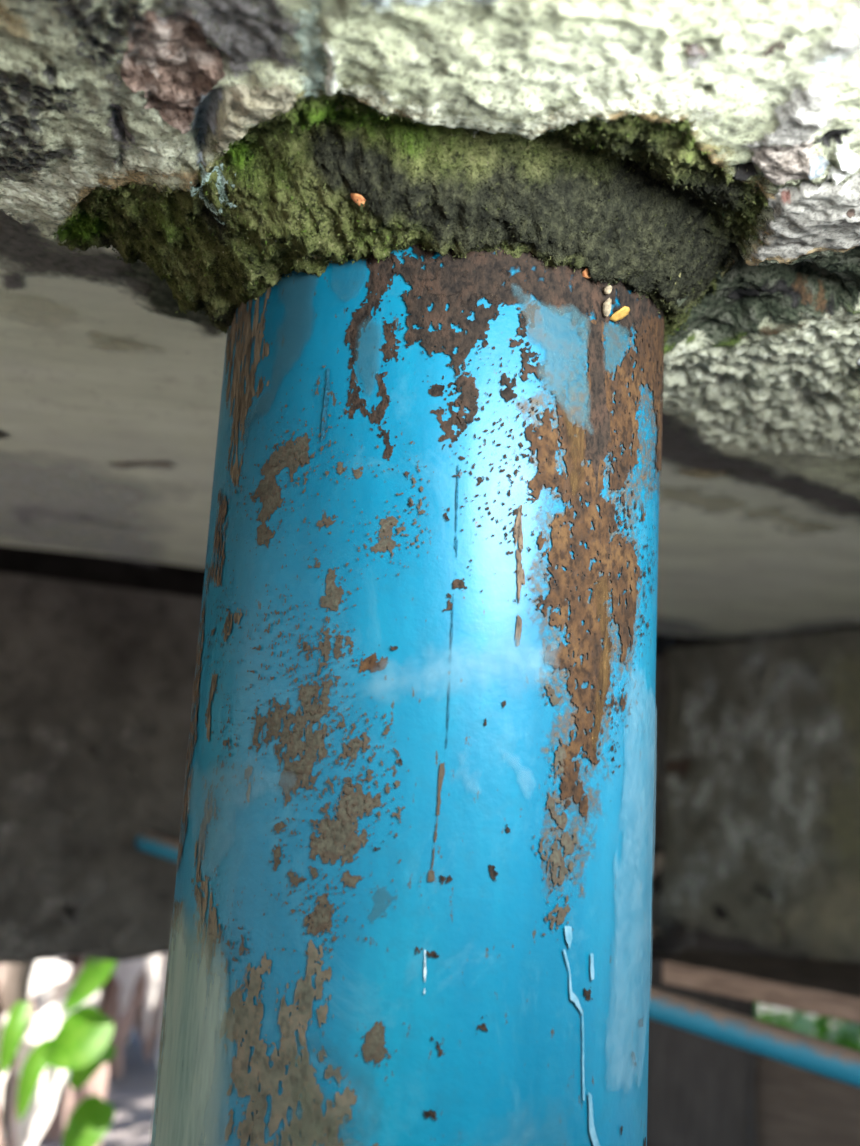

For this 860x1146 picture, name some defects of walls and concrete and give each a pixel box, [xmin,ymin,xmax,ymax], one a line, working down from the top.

spalling [0,9,295,300]
damp [23,0,329,97]
damp [190,87,237,225]
peeling [732,84,860,261]
peeling [422,345,559,573]
peeling [155,252,434,1146]
peeling [443,559,473,612]
corrosion [389,244,664,940]